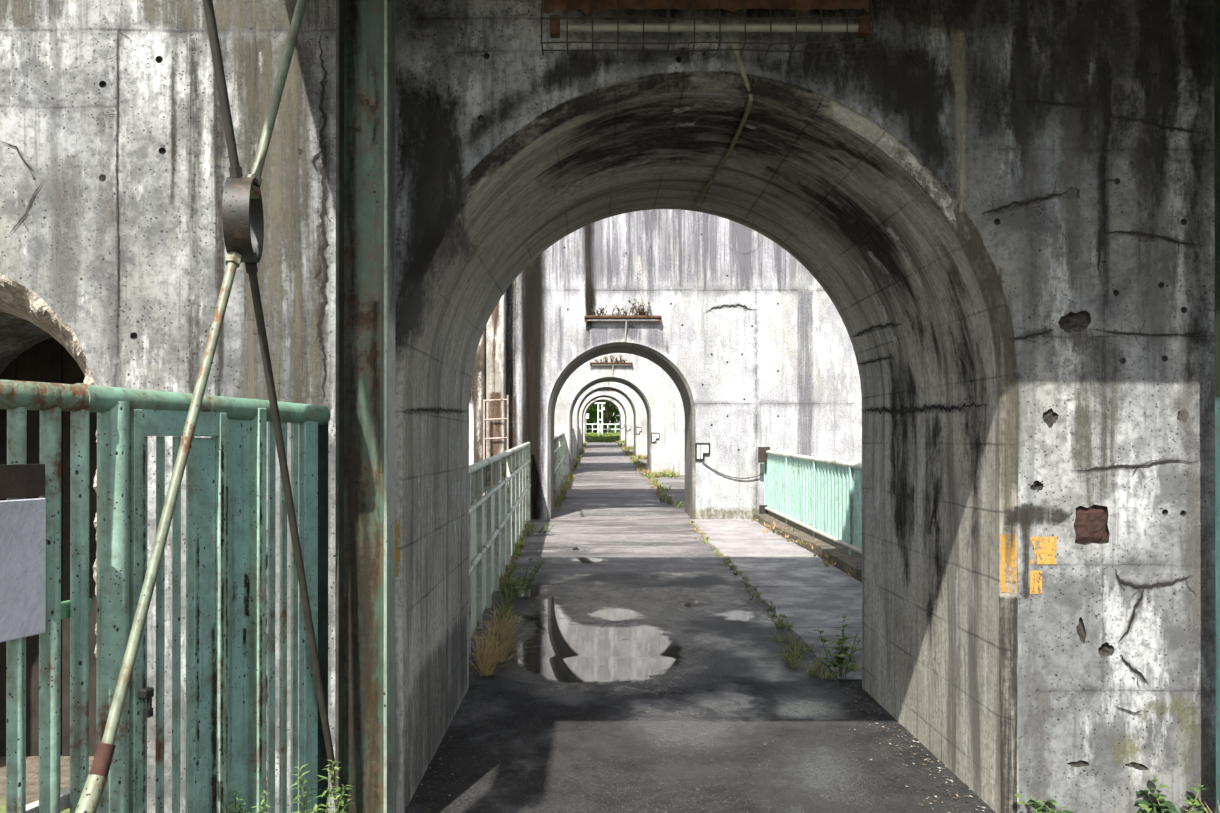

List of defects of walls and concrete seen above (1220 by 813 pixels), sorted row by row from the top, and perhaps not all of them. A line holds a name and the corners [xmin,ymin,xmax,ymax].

crack [982,52,1213,285]
crack [312,35,335,402]
spalling [1058,310,1091,333]
crack [853,322,899,374]
corrosion [343,0,380,813]
damp [395,0,1214,813]
crack [861,385,988,426]
spalling [1042,408,1059,428]
crack [1071,459,1198,477]
corrosion [1074,505,1107,545]
crack [1115,569,1195,715]